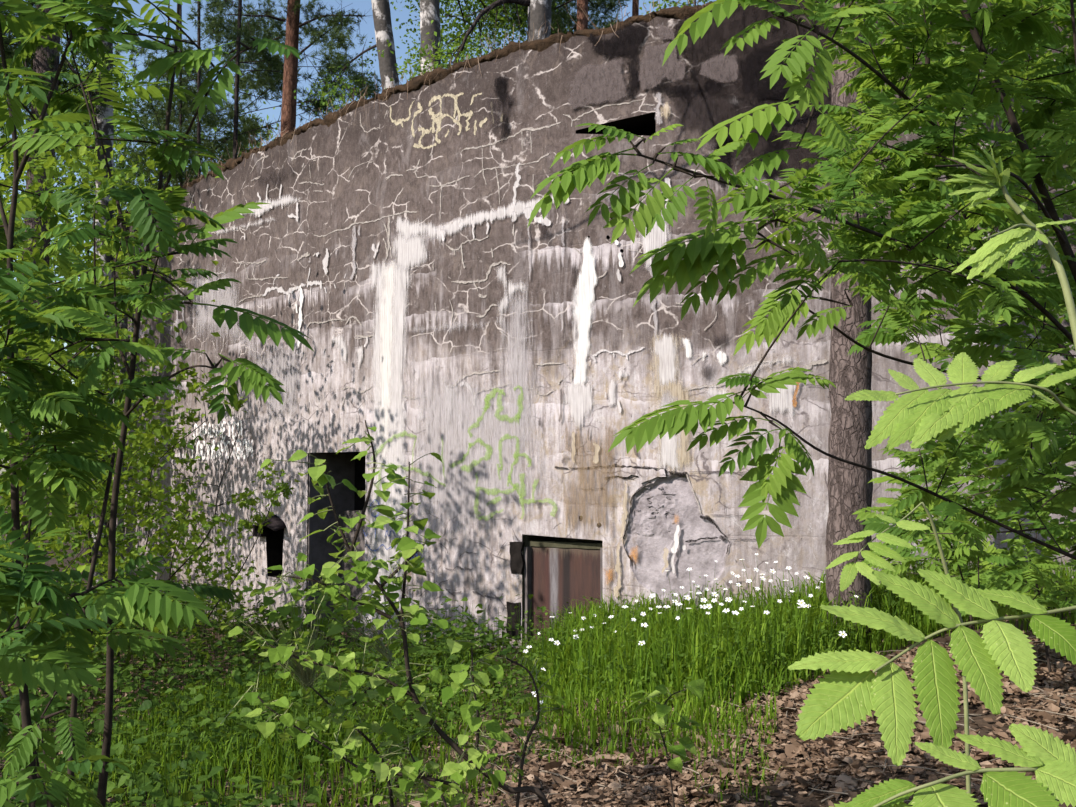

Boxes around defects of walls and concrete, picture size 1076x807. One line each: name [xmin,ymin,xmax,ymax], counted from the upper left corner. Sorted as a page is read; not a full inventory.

damp [588,0,833,188]
damp [217,170,298,239]
damp [309,248,337,274]
crack [214,92,654,339]
damp [615,240,624,281]
damp [332,195,569,628]
crack [402,347,644,399]
damp [559,238,597,440]
crack [651,297,827,393]
crack [426,543,508,614]
crack [555,464,773,568]
spalling [624,475,731,601]